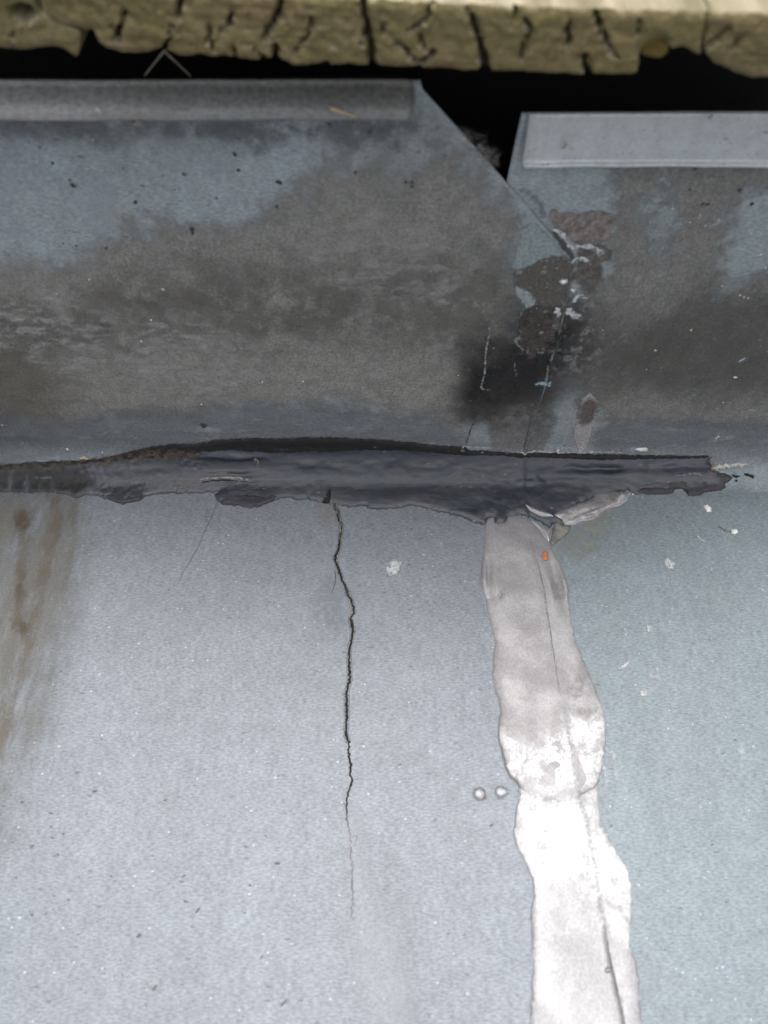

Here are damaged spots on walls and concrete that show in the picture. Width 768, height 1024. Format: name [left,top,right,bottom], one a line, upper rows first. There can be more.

water stain [0,139,768,447]
crack [330,503,357,918]